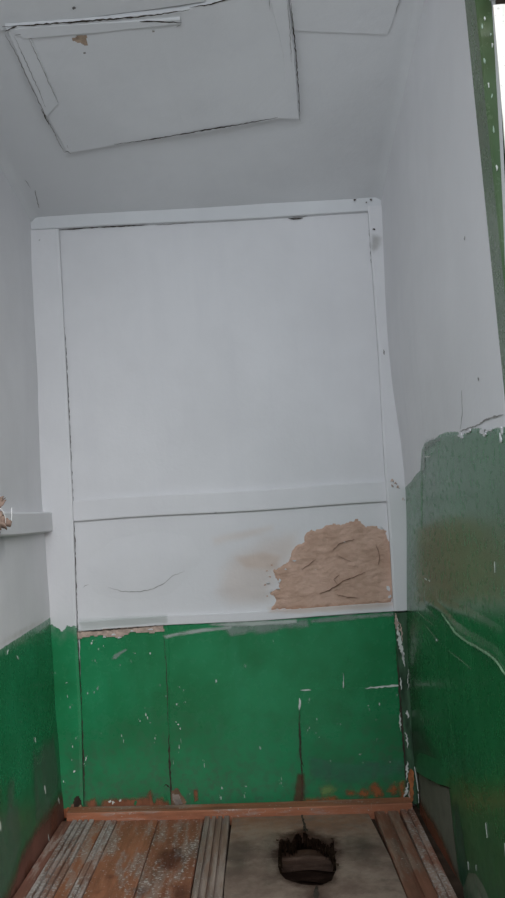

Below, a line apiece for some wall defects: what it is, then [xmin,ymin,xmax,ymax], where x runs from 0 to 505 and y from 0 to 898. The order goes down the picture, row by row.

peeling [72,35,88,54]
crack [3,0,226,152]
crack [120,0,300,144]
peeling [458,427,503,443]
flaking render [264,519,392,610]
peeling [77,625,164,663]
peeling [348,612,460,881]